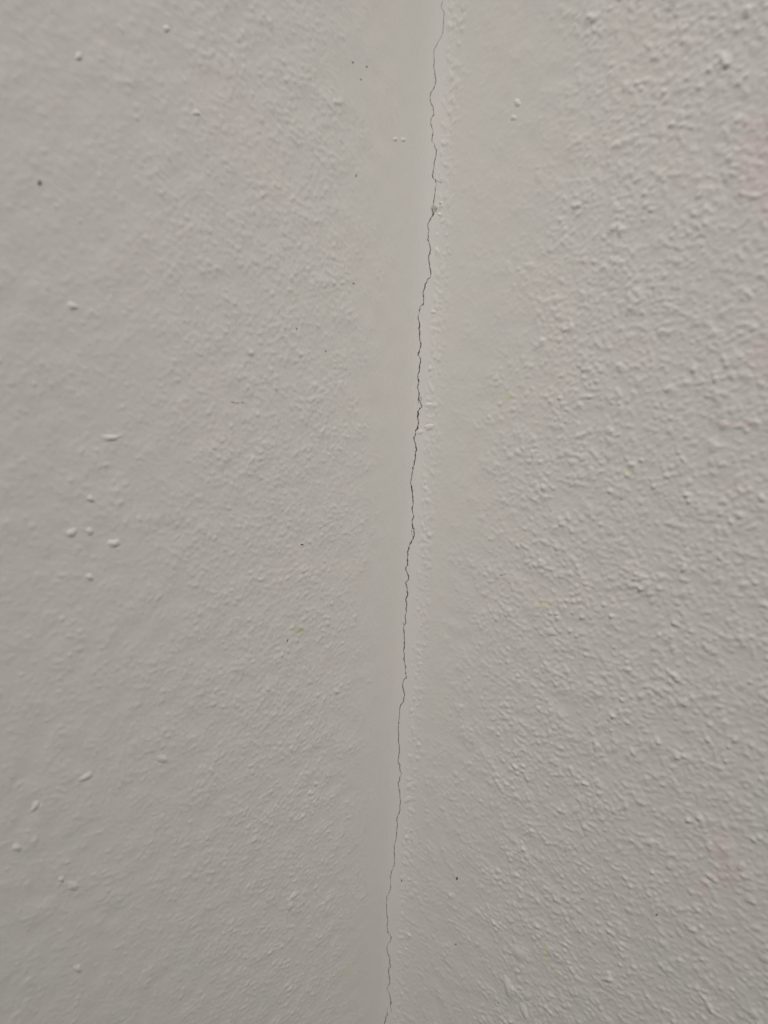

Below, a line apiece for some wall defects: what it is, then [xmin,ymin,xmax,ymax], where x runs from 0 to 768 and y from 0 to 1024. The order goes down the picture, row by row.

crack [384,1,444,1024]